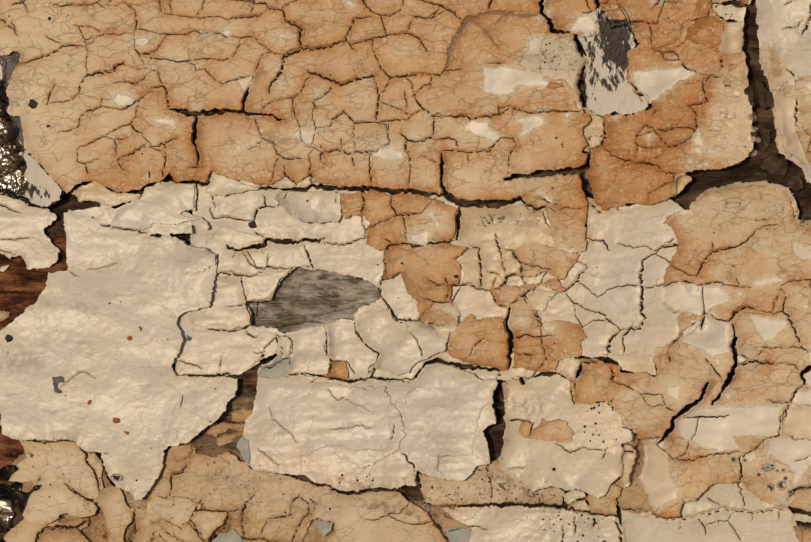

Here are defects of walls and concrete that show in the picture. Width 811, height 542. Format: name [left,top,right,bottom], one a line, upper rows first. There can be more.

crack [0,0,28,36]
peeling [685,0,751,52]
peeling [725,88,761,165]
peeling [773,75,811,157]
crack [20,0,731,432]
crack [365,224,811,542]
crack [128,483,366,542]